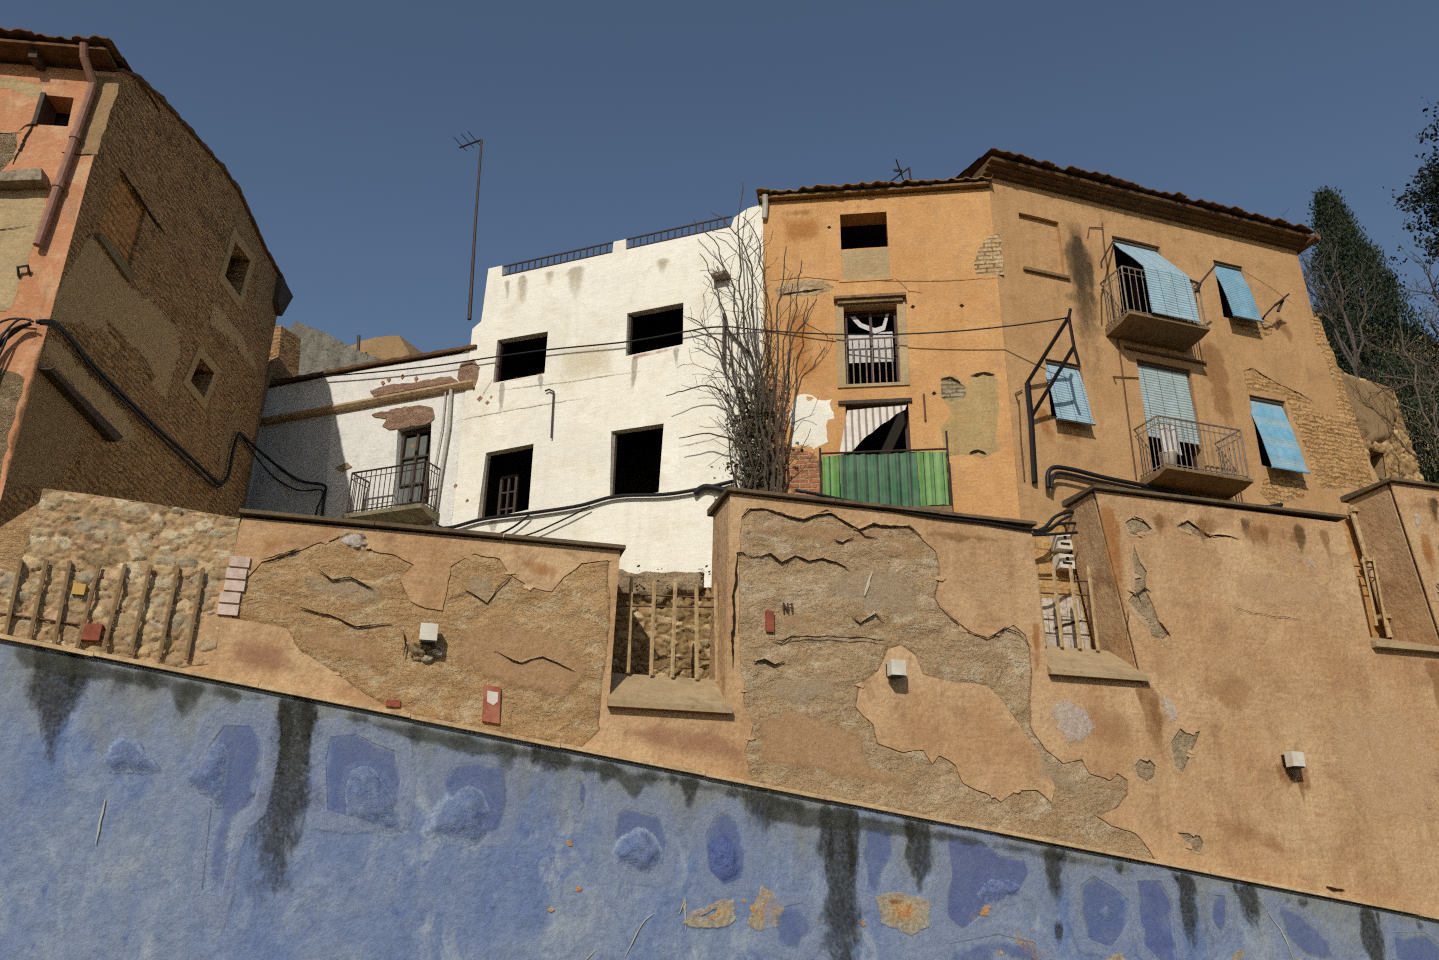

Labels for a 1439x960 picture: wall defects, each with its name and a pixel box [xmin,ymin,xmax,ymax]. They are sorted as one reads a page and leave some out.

crack [0,118,34,164]
water stain [1067,236,1093,323]
flaking render [370,361,493,447]
flaking render [765,373,834,497]
spalling [932,373,1000,458]
spalling [232,532,612,747]
water stain [255,698,319,882]
water stain [351,715,706,805]
spalling [738,509,1199,960]
peeling [683,886,785,930]
water stain [728,788,978,960]
spalling [1179,832,1207,854]